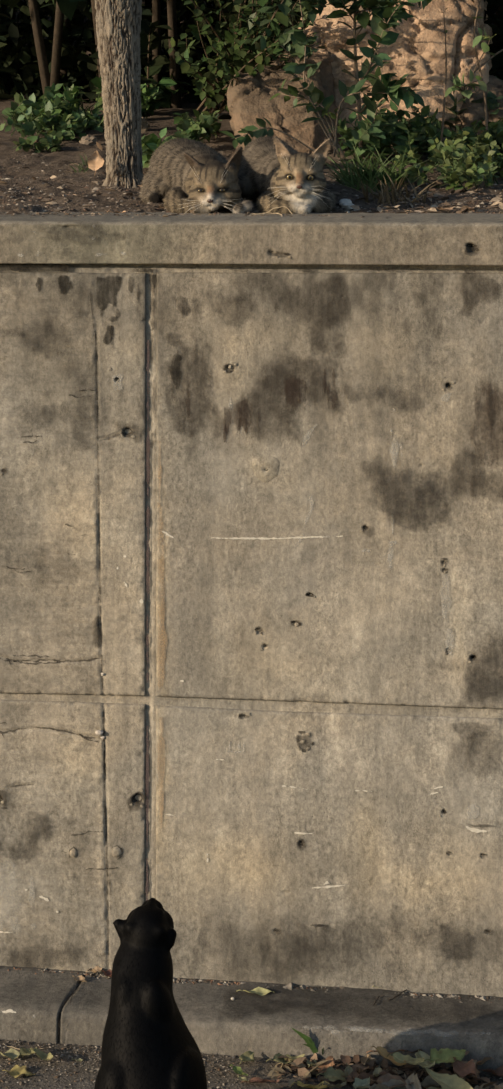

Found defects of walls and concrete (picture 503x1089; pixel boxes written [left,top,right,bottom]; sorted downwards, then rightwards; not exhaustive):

damp [97,274,156,329]
damp [170,349,215,435]
damp [455,384,503,497]
crack [0,299,118,955]